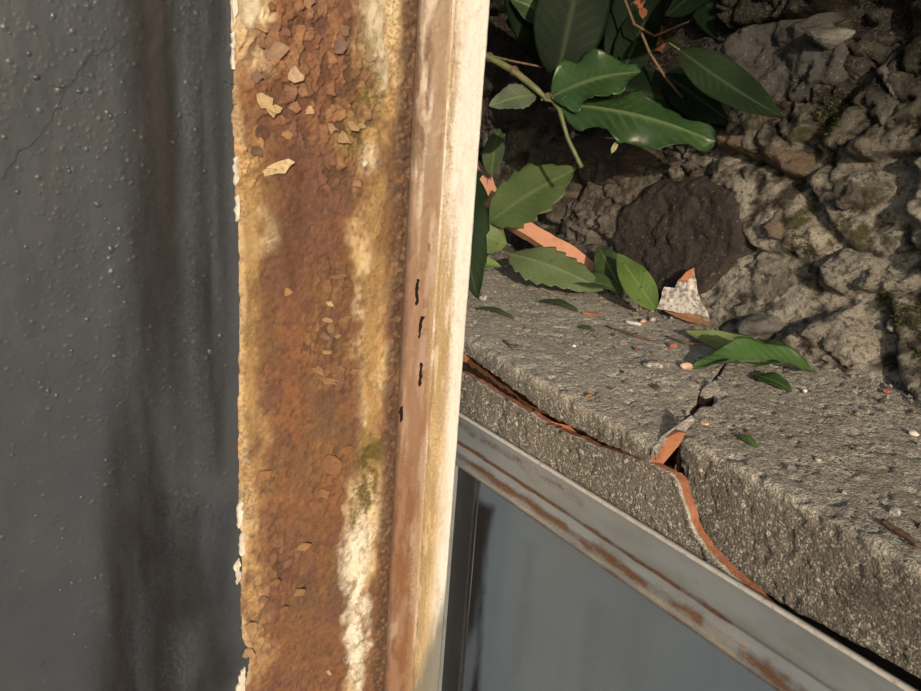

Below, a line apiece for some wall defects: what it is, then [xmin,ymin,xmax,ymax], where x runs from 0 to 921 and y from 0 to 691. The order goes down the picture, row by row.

peeling [230,0,238,69]
peeling [232,156,241,222]
rust [231,0,436,691]
crack [462,362,547,418]
crack [576,430,621,450]
rust [457,441,569,531]
peeling [233,501,246,584]
rust [579,525,680,590]
rust [673,602,732,625]
peeling [236,666,246,691]